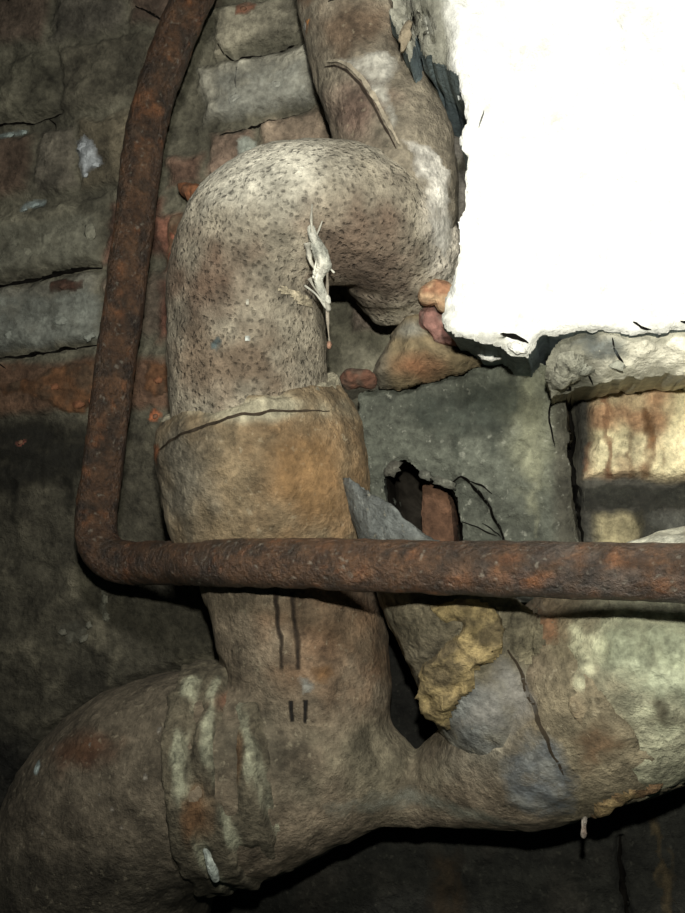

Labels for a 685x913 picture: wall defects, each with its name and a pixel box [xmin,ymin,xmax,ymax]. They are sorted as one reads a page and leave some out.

peeling [384,460,403,478]
peeling [419,470,457,490]
crack [452,476,505,540]